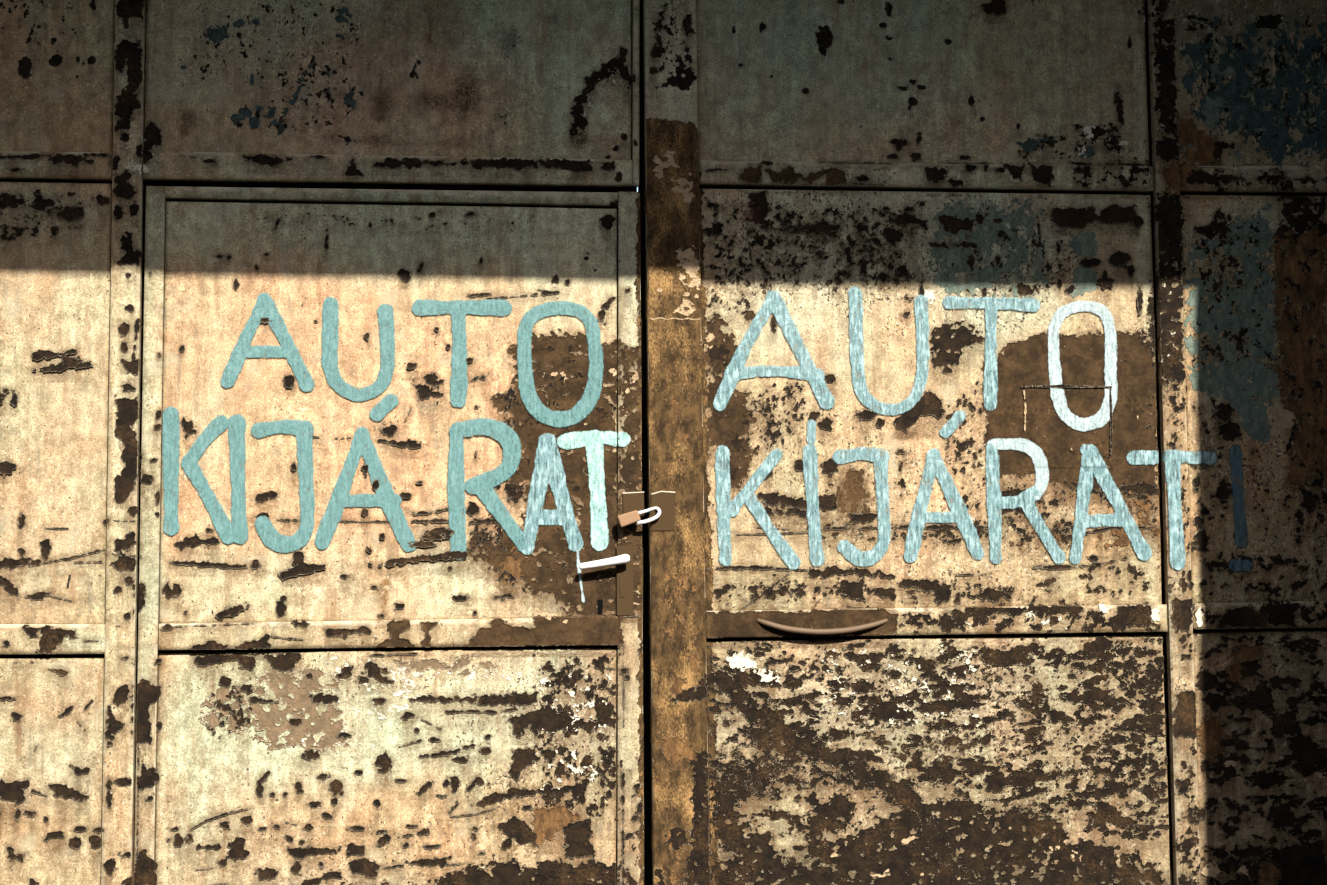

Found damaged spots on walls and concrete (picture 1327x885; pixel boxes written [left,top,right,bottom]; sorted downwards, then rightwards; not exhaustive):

peeling [0,0,97,79]
corrosion [242,153,293,167]
corrosion [345,3,697,182]
peeling [1179,10,1327,167]
peeling [613,117,1100,885]
corrosion [663,0,1327,885]
corrosion [167,328,643,885]
spalling [0,779,89,806]
corrosion [0,679,163,885]
spalling [256,770,271,797]
peeling [198,653,539,757]